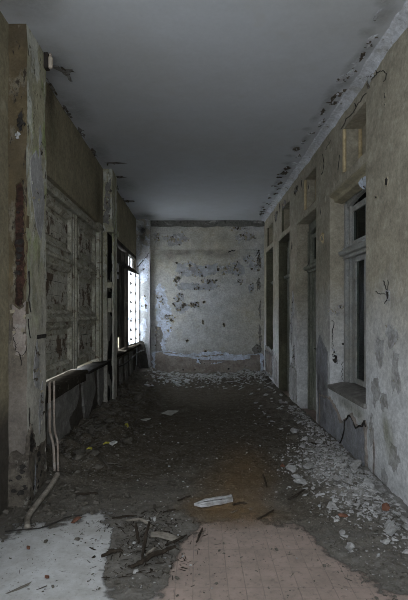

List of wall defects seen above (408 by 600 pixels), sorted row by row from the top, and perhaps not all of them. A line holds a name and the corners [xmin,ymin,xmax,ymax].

peeling [260,34,378,215]
spalling [10,125,45,357]
spalling [138,254,279,387]
crack [339,415,366,443]